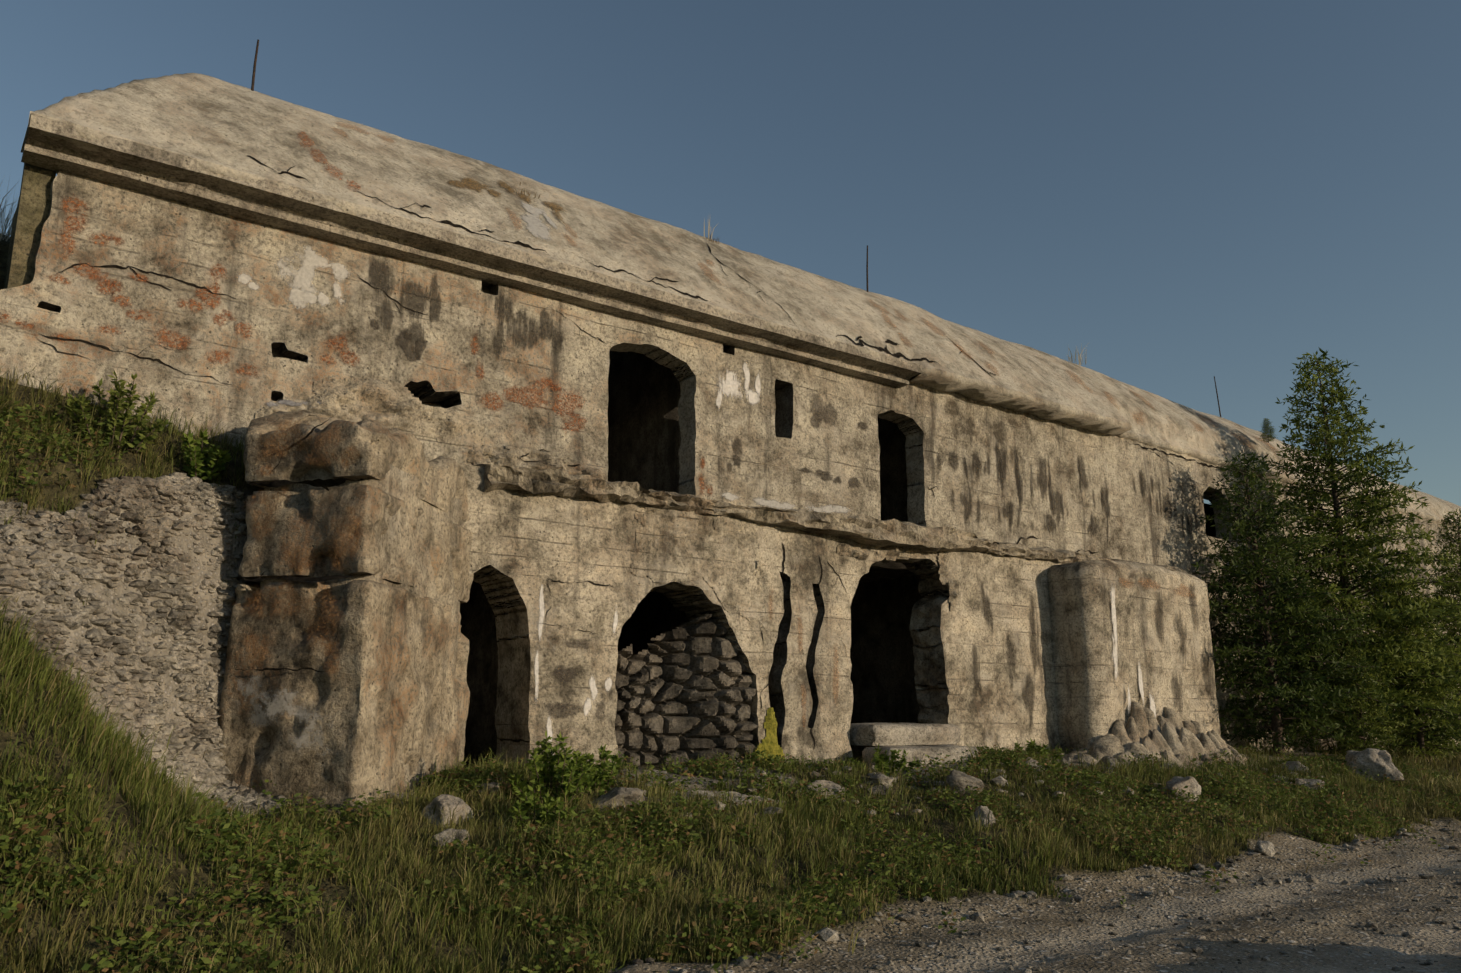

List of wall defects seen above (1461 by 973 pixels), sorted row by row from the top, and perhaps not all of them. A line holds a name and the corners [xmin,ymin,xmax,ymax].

crack [357,191,549,255]
corrosion [50,198,188,349]
crack [12,330,246,393]
crack [58,263,236,299]
corrosion [179,264,252,337]
spalling [267,373,607,481]
leakage [493,296,563,357]
corrosion [470,337,587,431]
leakage [937,446,1069,533]
leakage [1078,458,1110,539]
peeling [629,492,848,622]
crack [759,543,848,751]